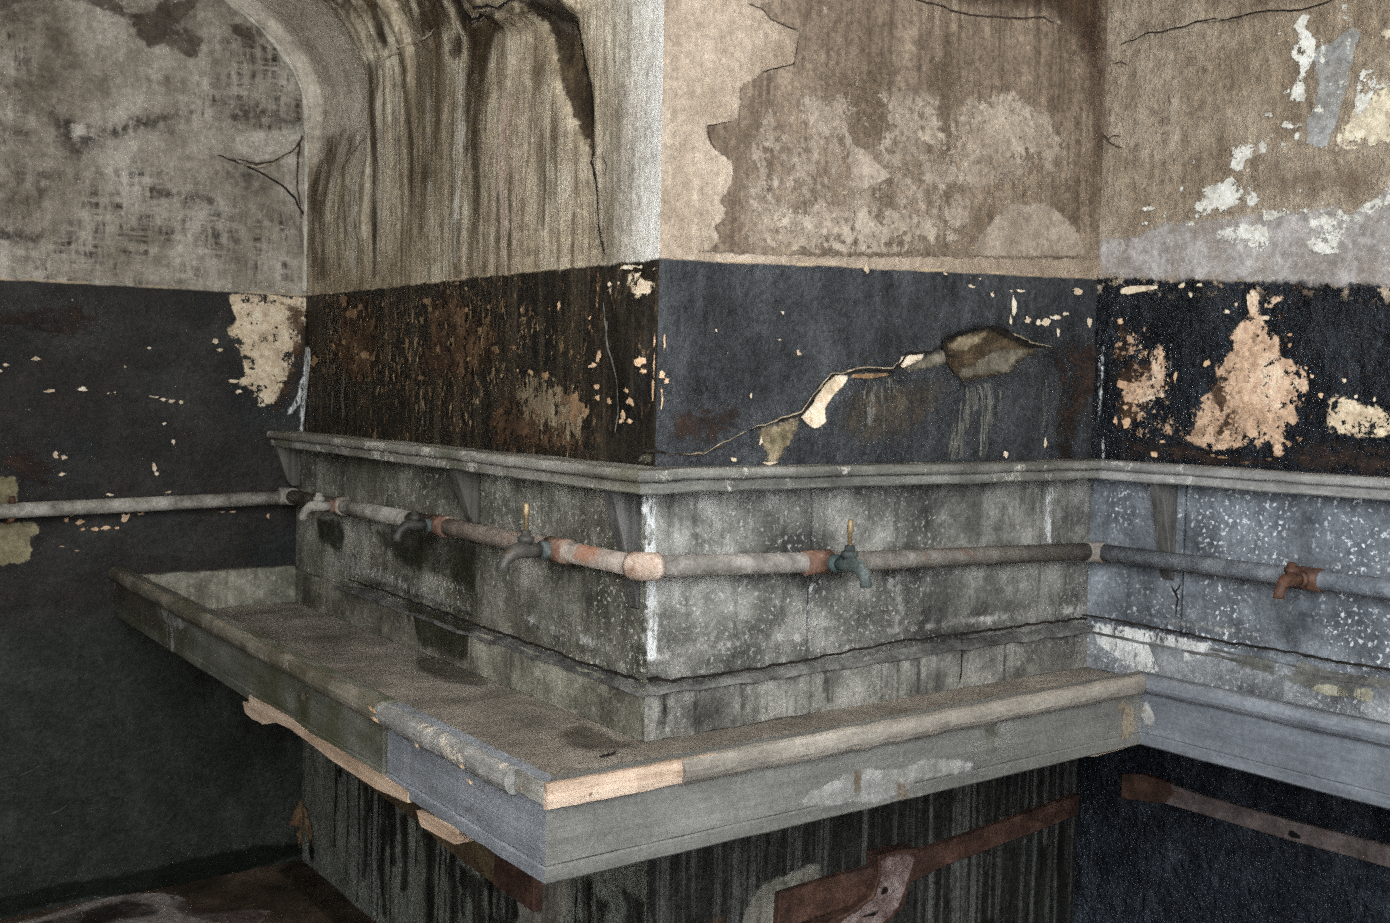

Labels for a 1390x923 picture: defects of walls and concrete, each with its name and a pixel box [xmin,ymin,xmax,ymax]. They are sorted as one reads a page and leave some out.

crack [1113,0,1348,65]
crack [219,135,304,215]
water stain [310,0,561,279]
crack [590,150,607,254]
peeling [699,0,1390,465]
peeling [213,265,655,451]
peeling [634,335,669,409]
crack [632,325,1052,462]
peeling [65,512,144,531]
water stain [317,520,485,684]
water stain [645,581,668,661]
water stain [0,763,518,923]